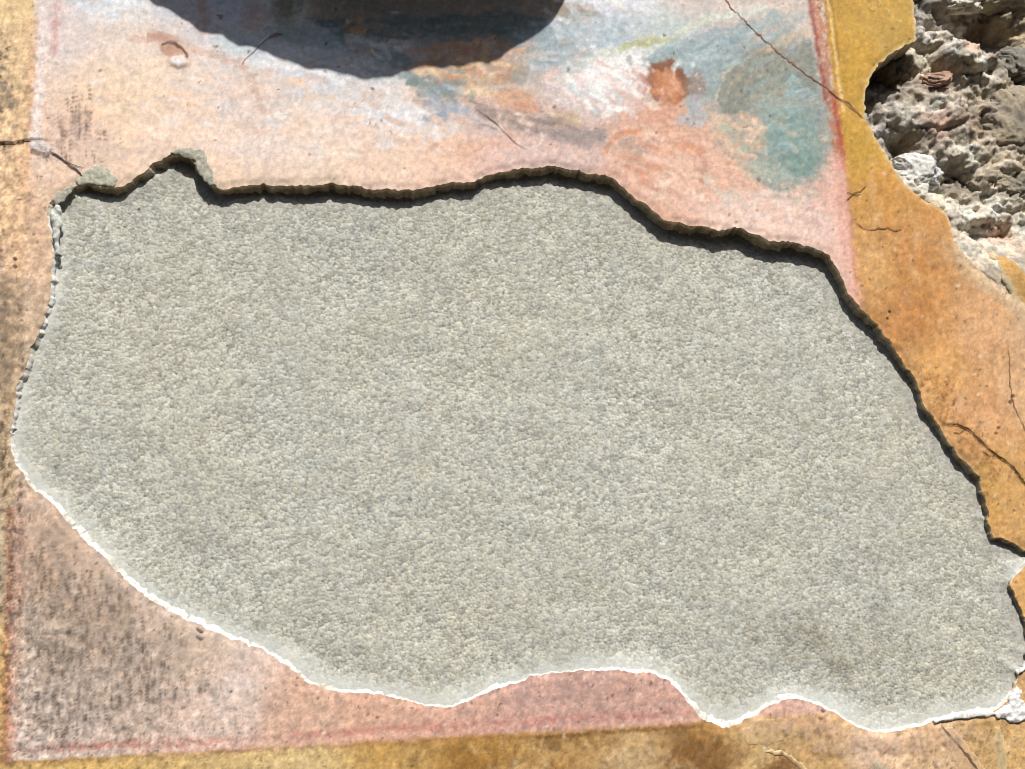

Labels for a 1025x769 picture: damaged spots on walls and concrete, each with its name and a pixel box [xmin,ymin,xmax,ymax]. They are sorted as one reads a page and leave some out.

crack [726,0,865,117]
crack [49,149,83,176]
crack [1008,345,1025,429]
spalling [10,147,1025,733]
crack [948,424,1025,484]
water stain [19,618,165,743]
peeling [764,749,807,769]
peeling [944,727,985,769]